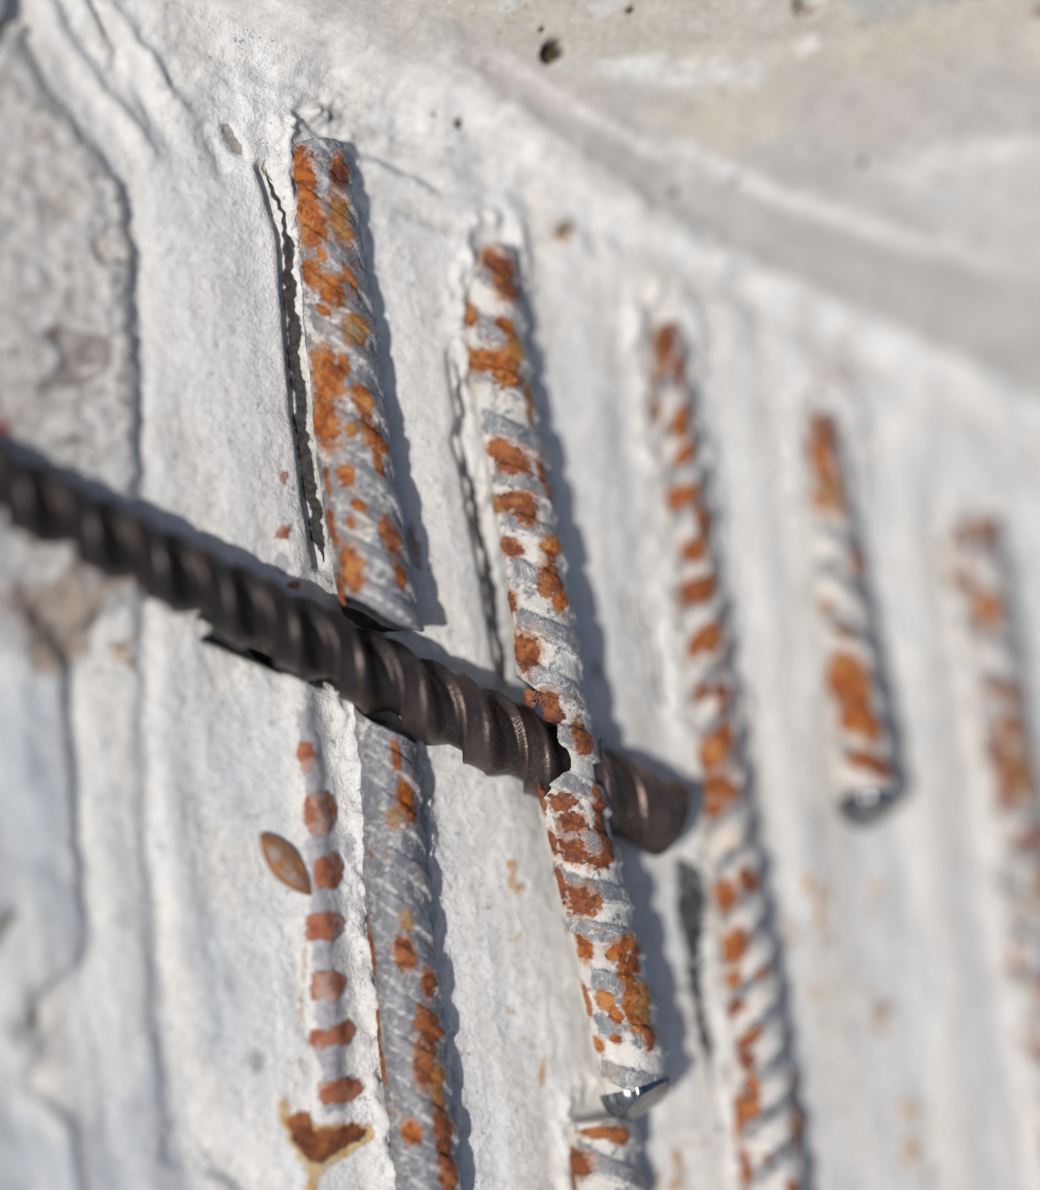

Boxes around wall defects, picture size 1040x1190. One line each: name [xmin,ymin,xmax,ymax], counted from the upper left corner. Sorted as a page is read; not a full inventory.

crack [0,0,13,44]
spalling [0,22,139,471]
spalling [221,124,242,156]
spalling [245,644,291,673]
corrosion [260,709,374,1190]
spalling [292,137,425,632]
spalling [353,705,462,1190]
corrosion [507,860,526,892]
spalling [465,242,672,1190]
spalling [650,321,809,1190]
spalling [806,410,904,830]
spalling [956,515,1040,1146]